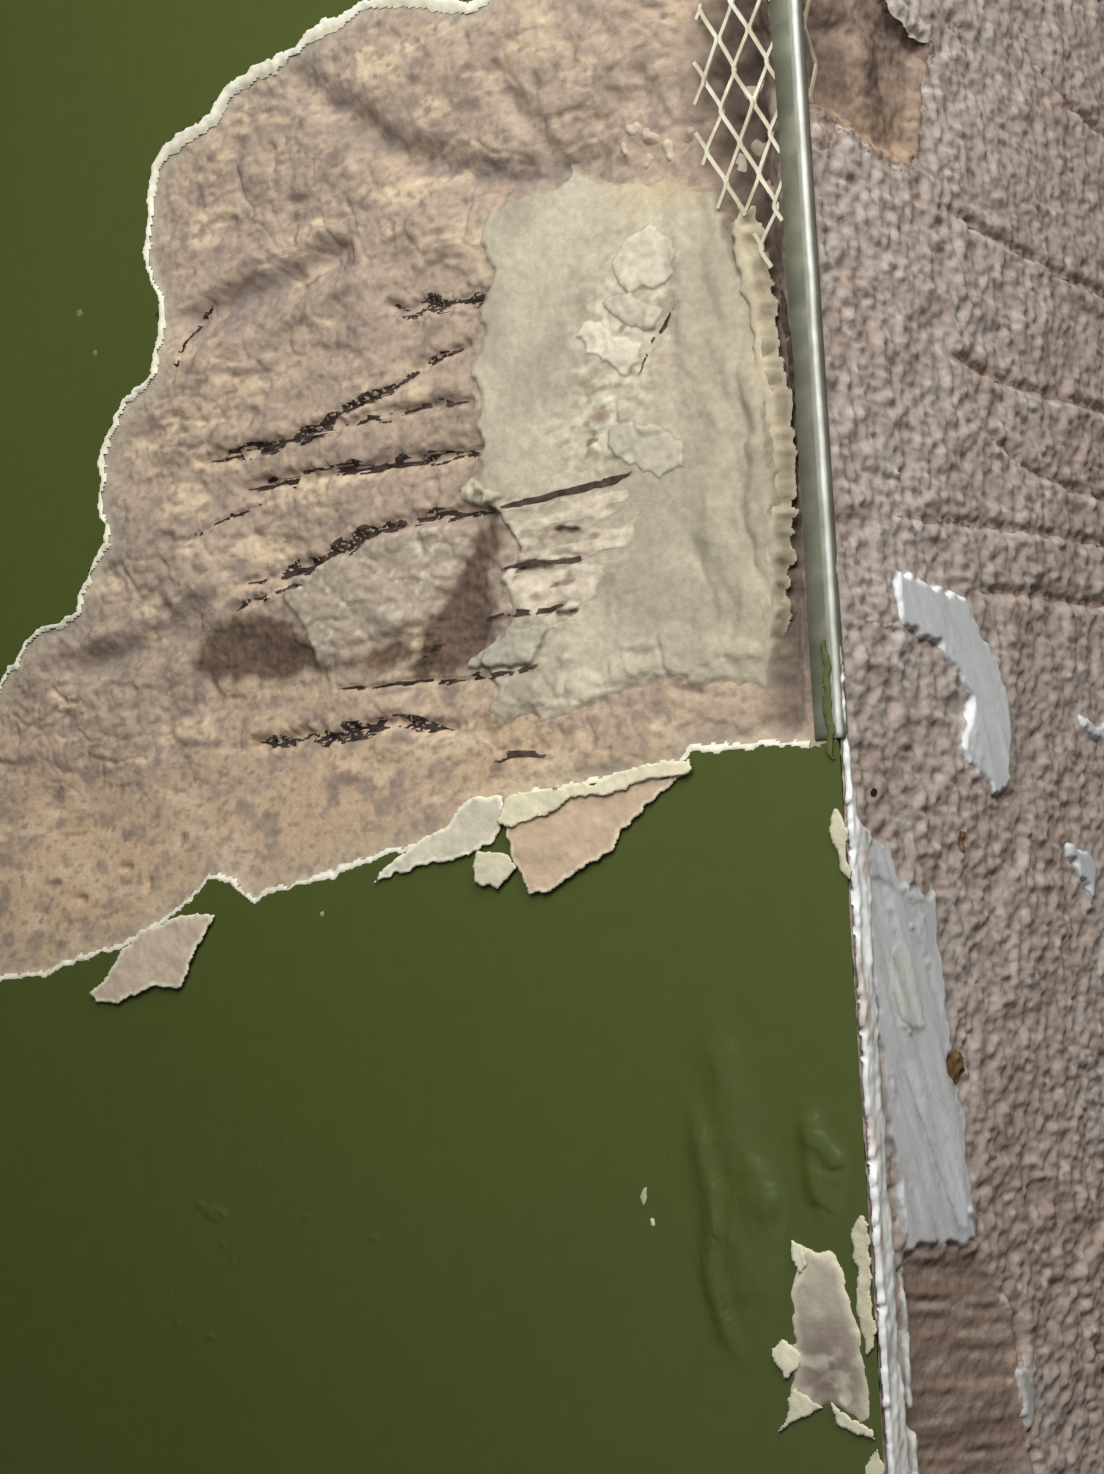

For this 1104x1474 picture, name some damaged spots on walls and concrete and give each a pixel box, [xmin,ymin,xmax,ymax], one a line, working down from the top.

flaking render [802,0,965,175]
crack [173,306,214,367]
crack [395,291,487,320]
crack [195,348,481,536]
flaking render [0,0,837,1004]
crack [236,471,632,612]
crack [486,604,563,619]
crack [261,663,538,748]
peeling [772,1240,875,1440]